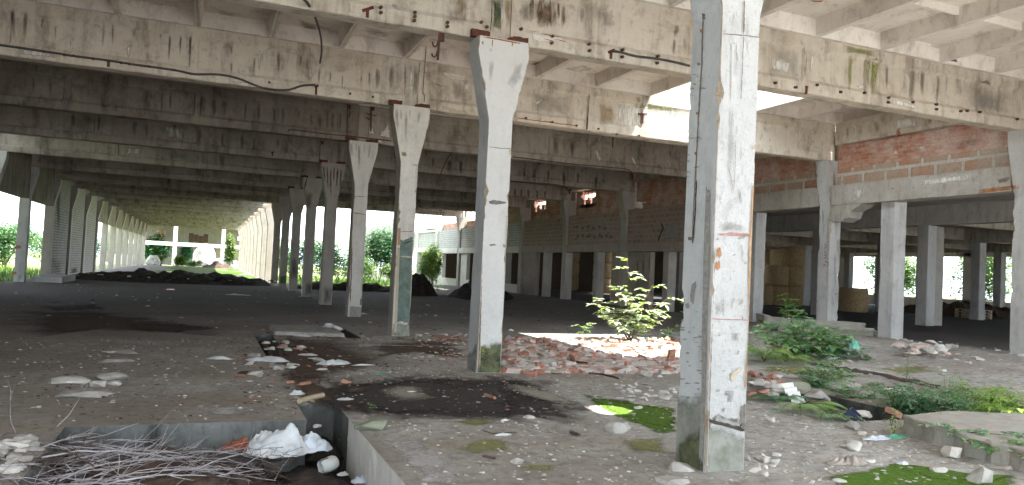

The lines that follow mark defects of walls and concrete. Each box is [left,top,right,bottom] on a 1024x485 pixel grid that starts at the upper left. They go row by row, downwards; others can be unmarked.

leakage [524,0,565,26]
leakage [848,46,887,89]
spalling [675,185,754,472]